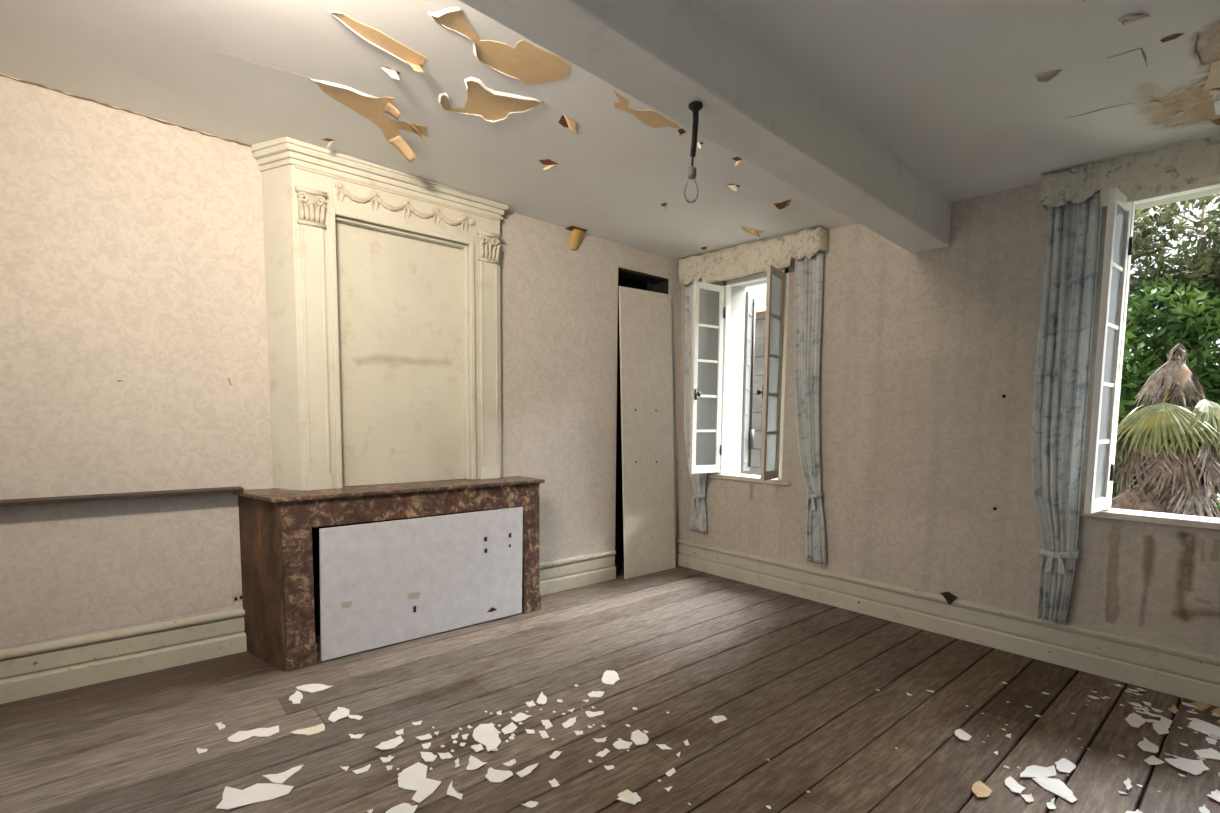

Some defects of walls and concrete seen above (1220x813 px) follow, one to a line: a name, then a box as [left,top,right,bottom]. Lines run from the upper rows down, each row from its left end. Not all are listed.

peeling [329,11,427,80]
peeling [427,7,570,122]
peeling [311,79,429,163]
peeling [613,90,686,138]